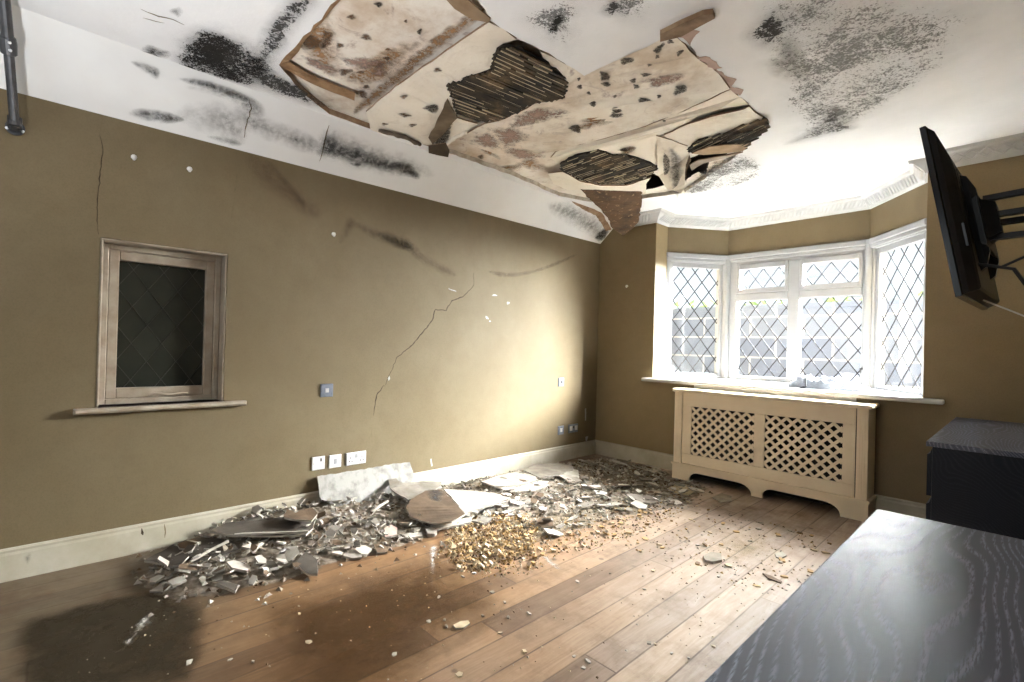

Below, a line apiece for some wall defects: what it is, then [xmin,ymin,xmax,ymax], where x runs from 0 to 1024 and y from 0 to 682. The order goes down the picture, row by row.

water stain [526,1,574,42]
water stain [177,0,333,110]
peeling [679,30,743,95]
water stain [753,0,961,138]
water stain [136,111,177,121]
crack [96,116,104,234]
water stain [323,139,416,177]
spalling [572,201,611,231]
crack [367,274,474,450]